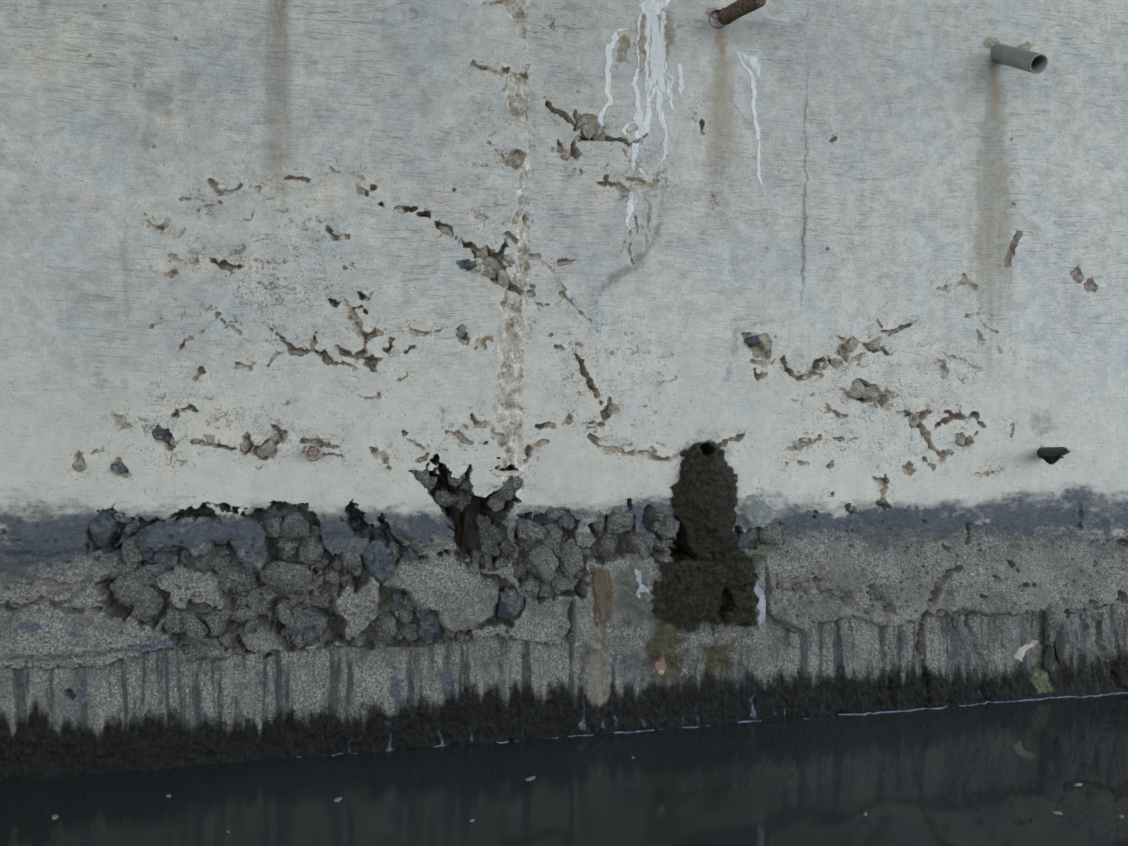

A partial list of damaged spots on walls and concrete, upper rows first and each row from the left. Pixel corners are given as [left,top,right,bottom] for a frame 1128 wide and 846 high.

crack [195,201,224,212]
crack [254,0,678,516]
crack [149,291,410,382]
spalling [741,332,776,368]
spalling [840,377,900,411]
spalling [72,448,132,478]
leakage [0,503,455,579]
spalling [86,421,680,664]
leakage [734,487,1128,547]
leakage [754,579,766,626]
crack [915,523,972,675]
leakage [0,640,1128,781]